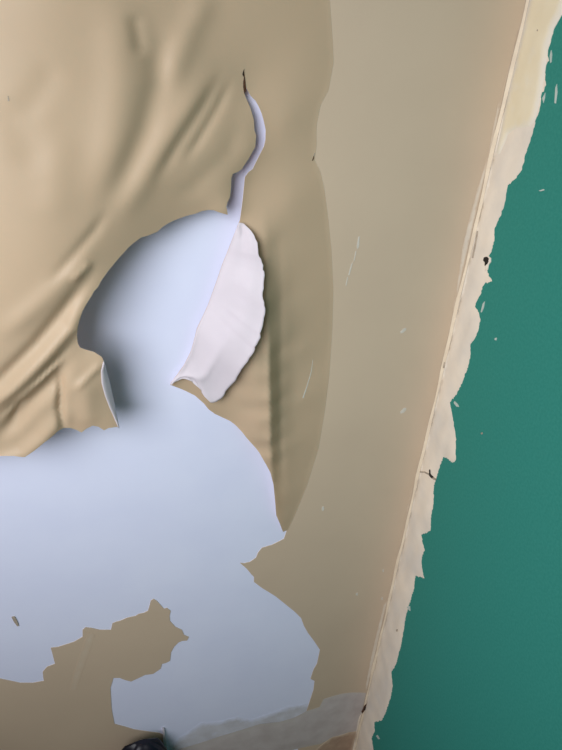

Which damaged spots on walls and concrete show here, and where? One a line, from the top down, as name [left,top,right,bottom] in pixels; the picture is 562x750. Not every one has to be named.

peeling [0,0,320,750]